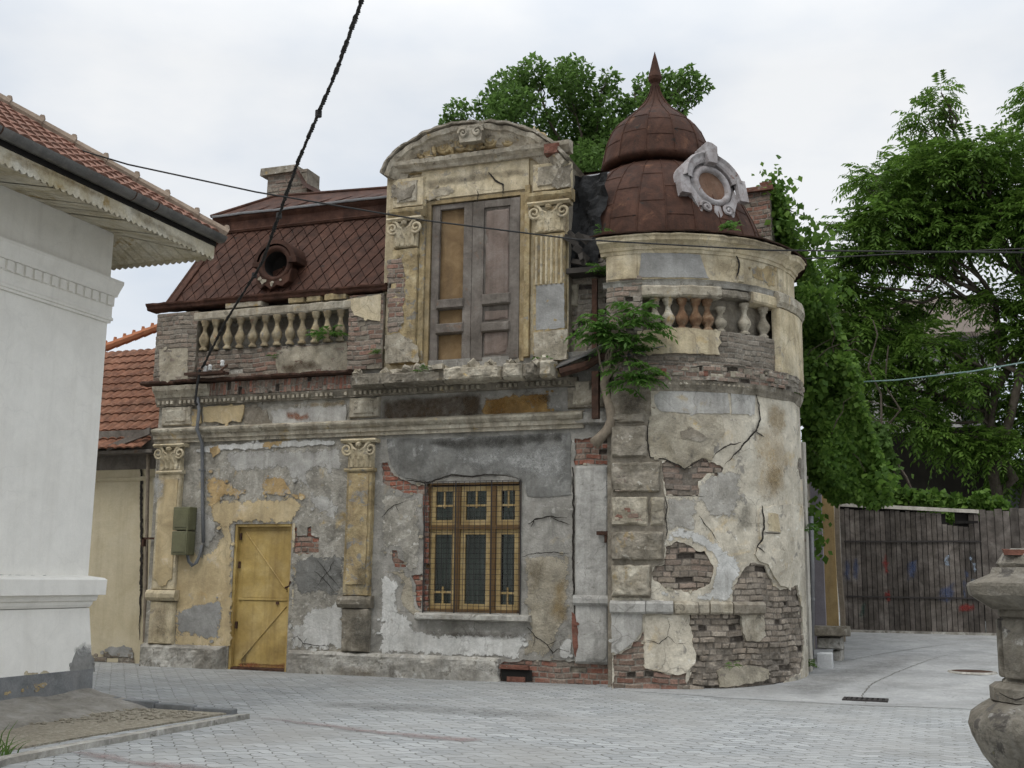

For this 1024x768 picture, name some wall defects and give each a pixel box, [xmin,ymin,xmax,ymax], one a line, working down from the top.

crack [477,172,504,202]
crack [382,474,520,517]
spalling [574,438,607,466]
spalling [654,456,723,497]
crack [646,394,764,470]
peeling [175,470,319,646]
spalling [382,462,430,610]
crack [523,467,575,614]
spalling [652,530,713,594]
crack [755,506,780,554]
spalling [442,563,805,689]